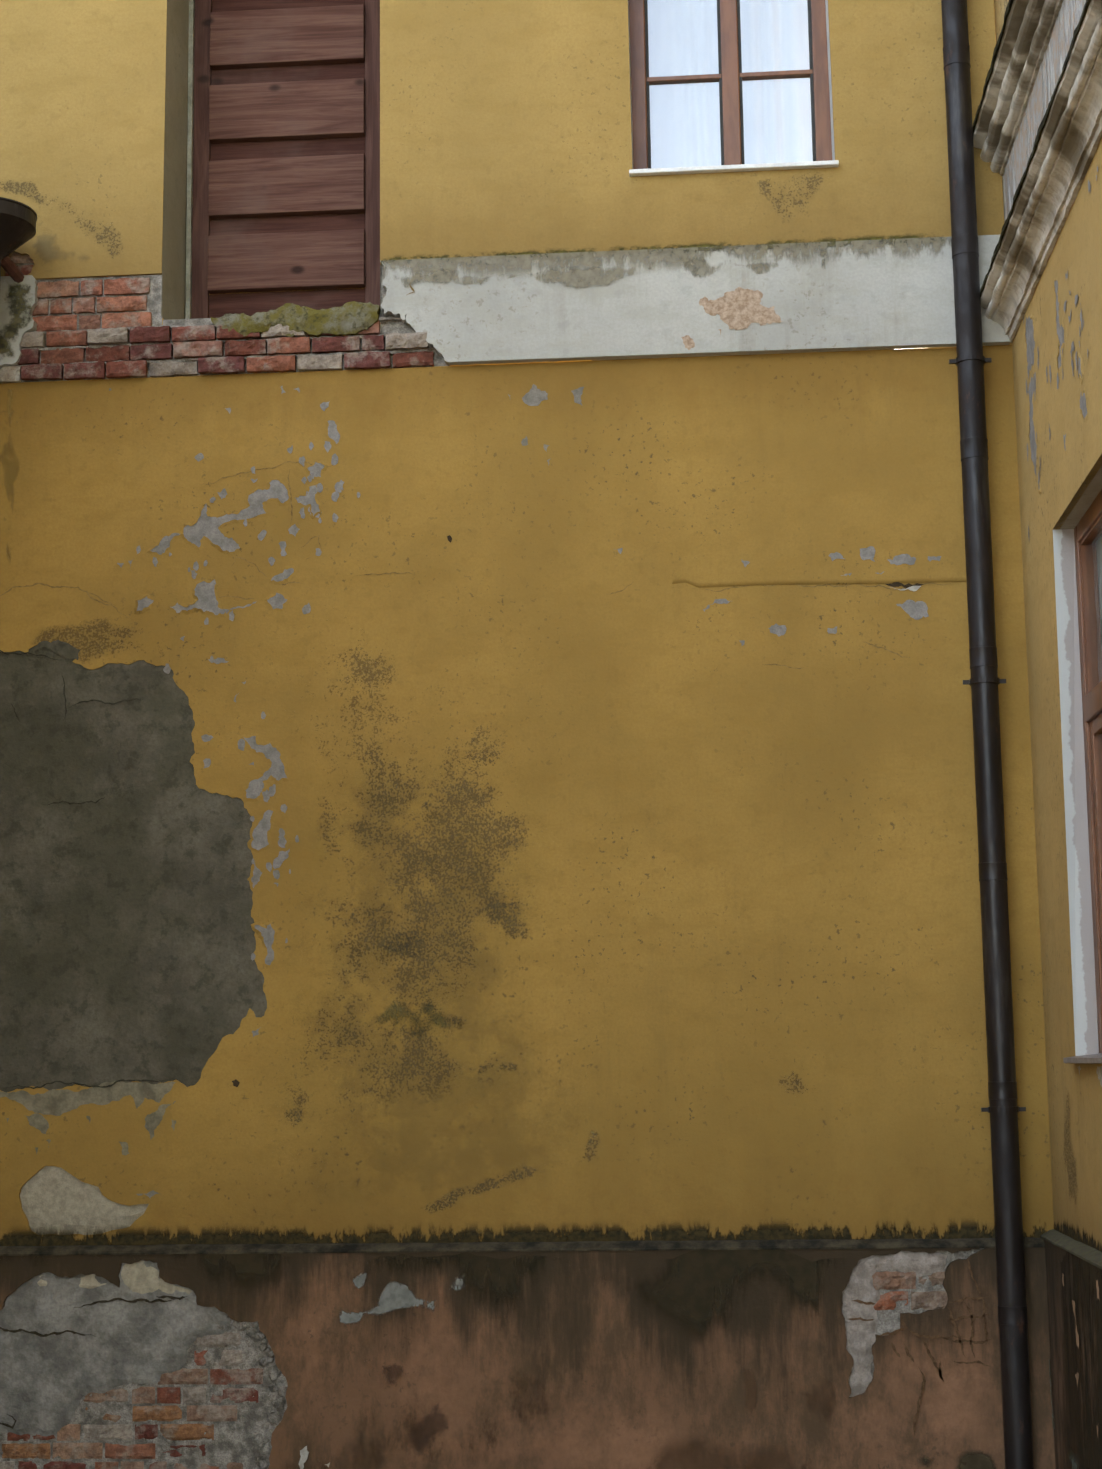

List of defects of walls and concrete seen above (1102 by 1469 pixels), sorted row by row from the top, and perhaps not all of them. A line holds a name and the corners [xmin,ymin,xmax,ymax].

leakage [1004,0,1086,217]
peeling [699,287,783,335]
peeling [117,401,361,625]
crack [688,582,953,592]
peeling [238,711,299,888]
spalling [6,1113,159,1235]
peeling [79,1261,192,1294]
peeling [339,1282,435,1324]
leakage [0,1223,995,1335]
spalling [842,1248,984,1397]
leakage [1023,1222,1102,1469]
leakage [324,1408,447,1469]